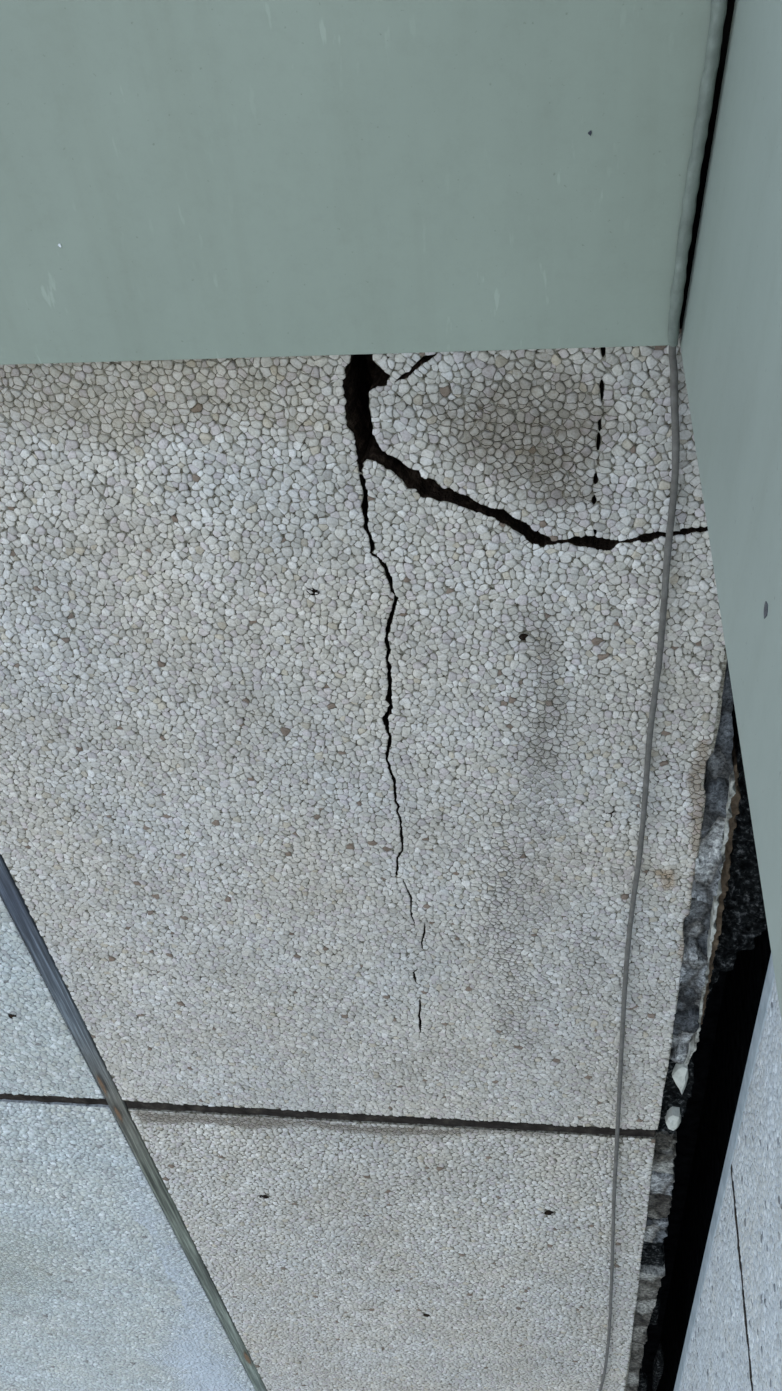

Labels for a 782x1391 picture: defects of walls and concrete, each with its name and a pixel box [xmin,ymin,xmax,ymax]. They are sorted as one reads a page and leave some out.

crack [342,347,708,1032]
spalling [626,660,771,1391]